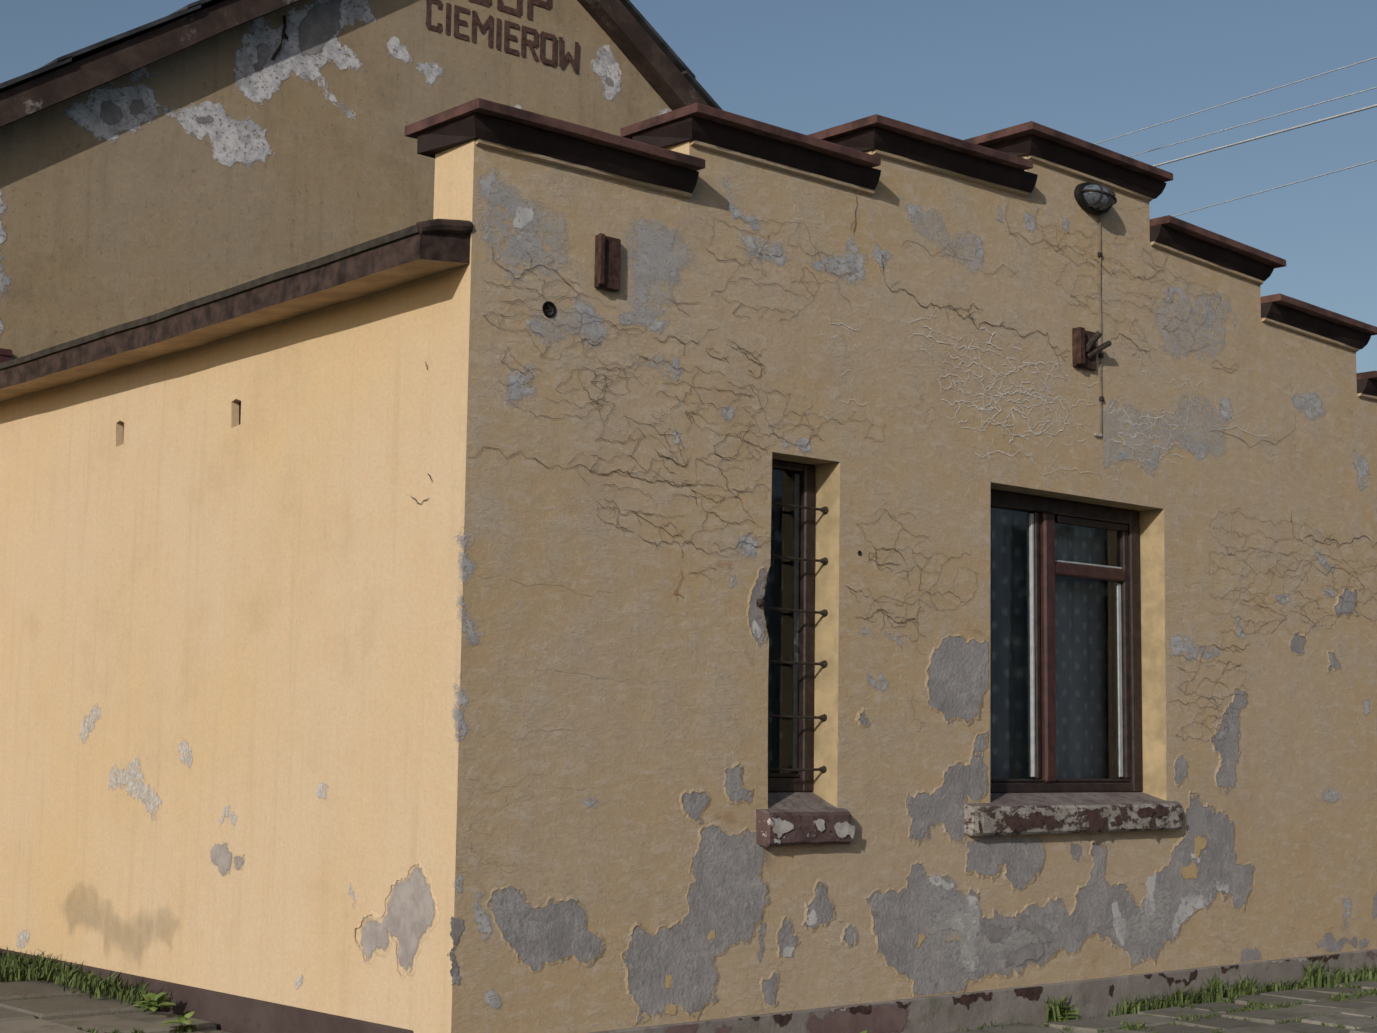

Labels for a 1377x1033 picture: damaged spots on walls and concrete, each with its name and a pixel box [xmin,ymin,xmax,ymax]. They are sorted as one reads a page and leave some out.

peeling [64,0,376,168]
peeling [0,191,11,292]
crack [468,194,1296,601]
crack [845,508,978,654]
crack [1170,508,1377,741]
peeling [349,633,1256,1033]
peeling [1214,898,1375,973]